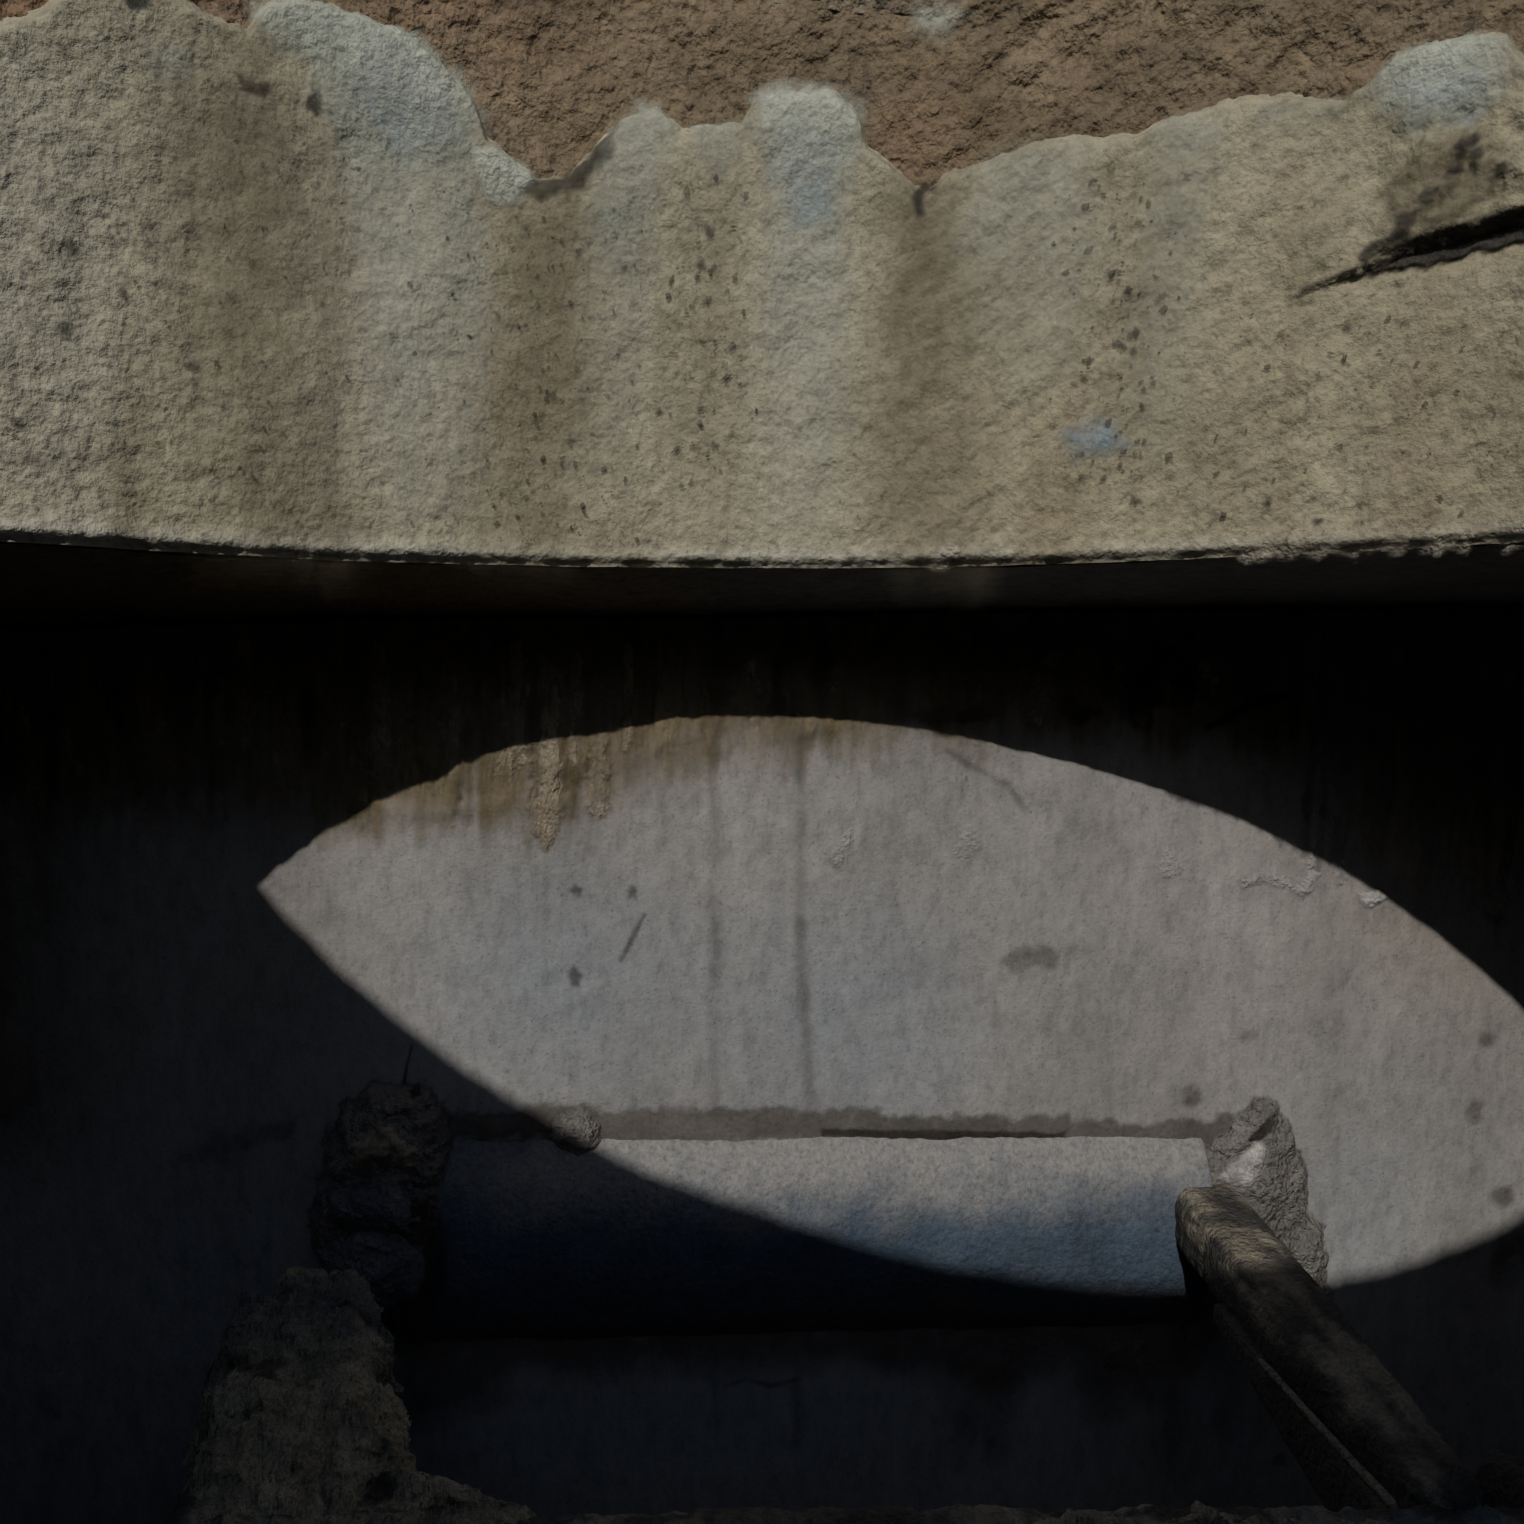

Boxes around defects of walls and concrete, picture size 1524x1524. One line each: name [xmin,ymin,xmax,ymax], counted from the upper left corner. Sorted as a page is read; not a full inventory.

spalling [206,74,287,120]
peeling [306,87,322,113]
spalling [1395,133,1507,229]
spalling [665,256,716,300]
spalling [1106,258,1149,309]
damp [1360,890,1388,908]
peeling [1221,1140,1268,1194]